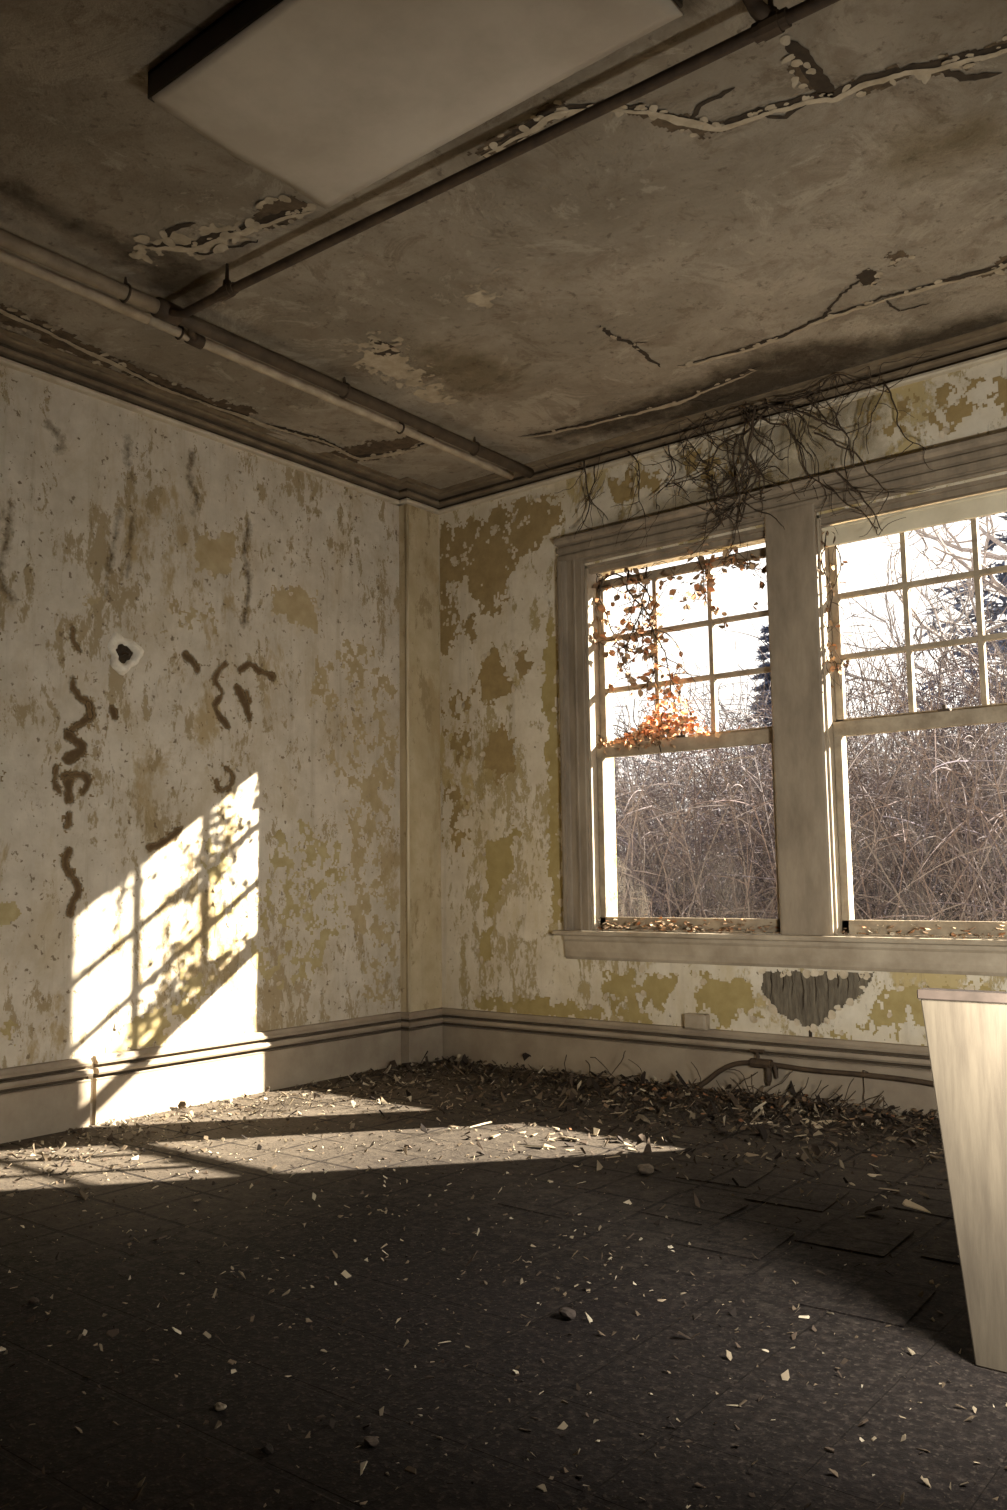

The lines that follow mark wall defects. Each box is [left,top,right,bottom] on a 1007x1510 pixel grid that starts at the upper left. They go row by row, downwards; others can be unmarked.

crack [475,0,1007,158]
peeling [129,194,307,266]
spalling [0,303,258,424]
spalling [302,430,433,463]
peeling [341,331,464,415]
crack [519,259,1007,438]
peeling [858,376,1007,439]
peeling [194,530,238,580]
peeling [270,585,321,634]
peeling [440,493,577,970]
peeling [106,632,400,1053]
spalling [473,965,1006,1046]